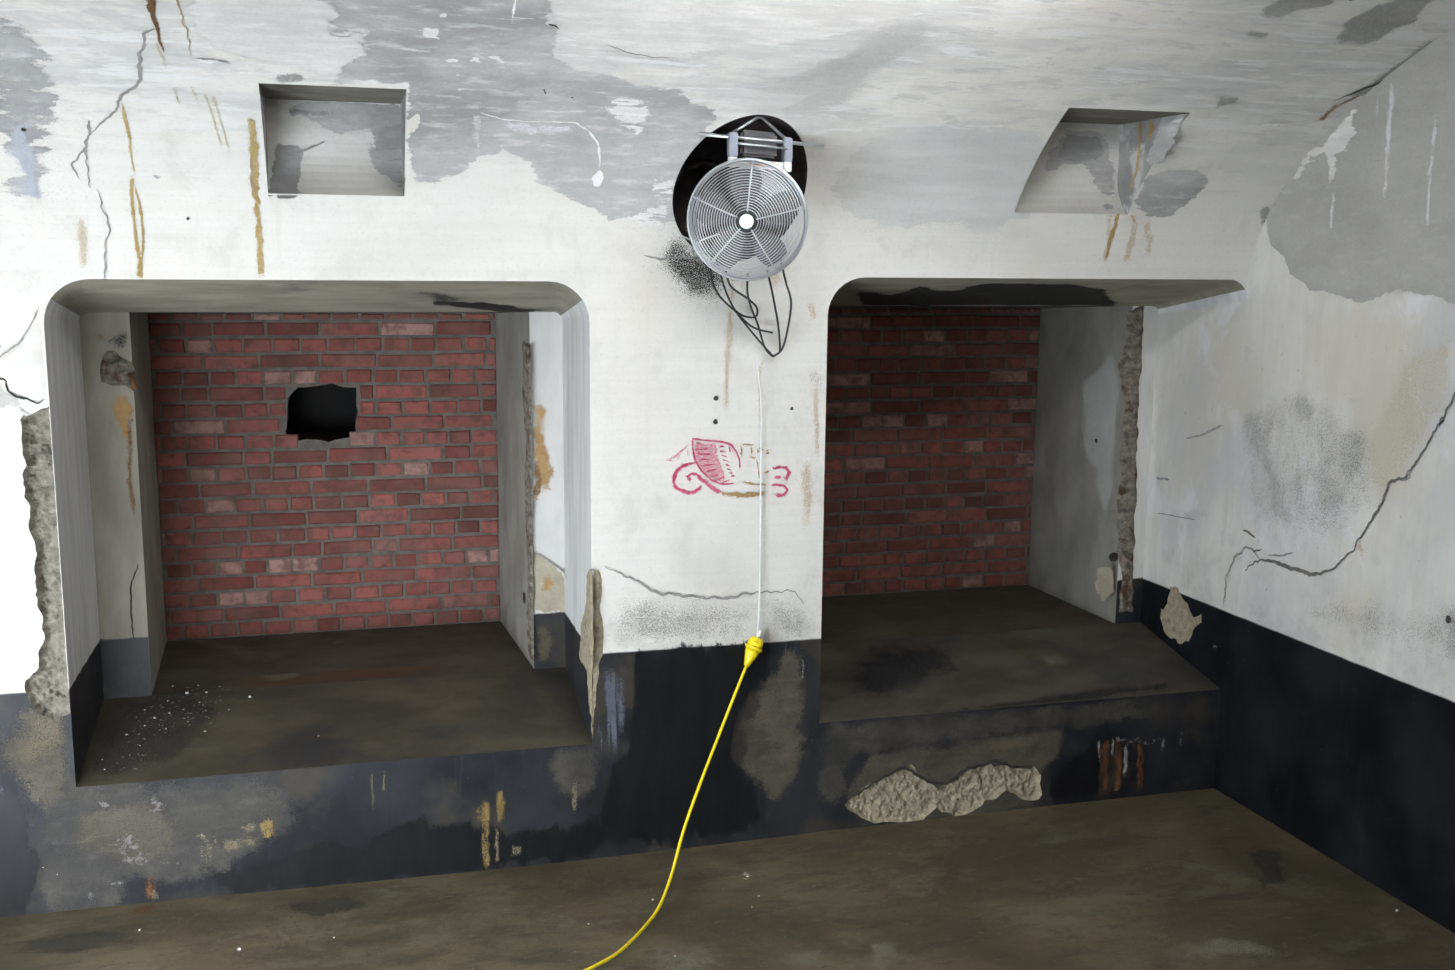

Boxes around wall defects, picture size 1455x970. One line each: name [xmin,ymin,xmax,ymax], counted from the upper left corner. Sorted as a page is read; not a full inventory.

corrosion [121,105,145,282]
crack [70,0,229,279]
corrosion [247,119,265,277]
peeling [182,0,929,223]
corrosion [1102,214,1153,263]
crack [0,378,43,404]
crack [1223,392,1455,605]
flaking render [0,406,131,913]
crack [605,566,803,603]
flaking render [1160,586,1201,644]
corrosion [476,791,522,868]
spalling [845,759,1042,823]